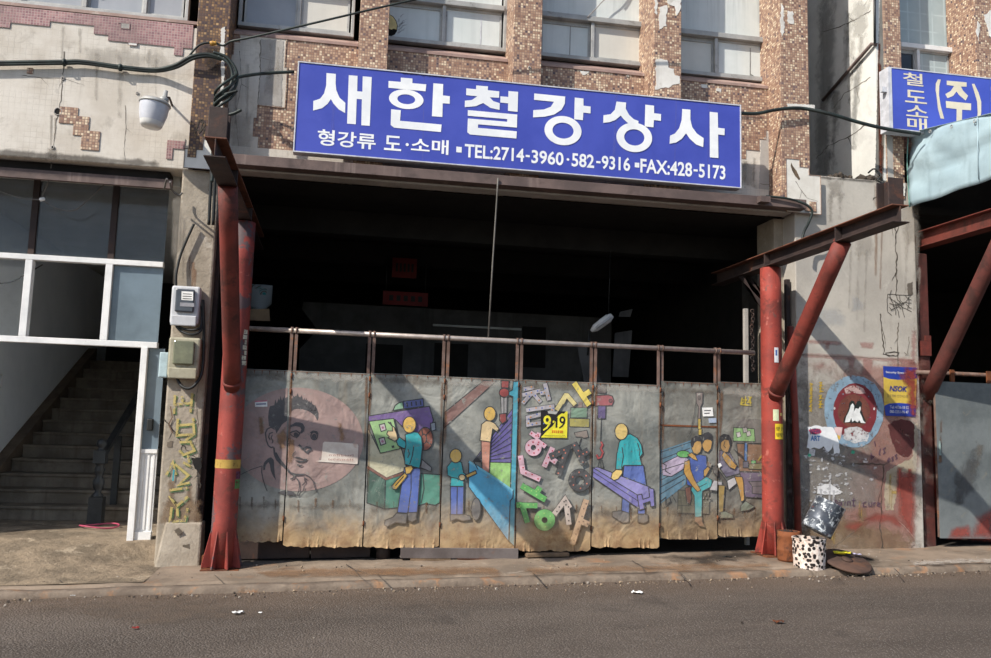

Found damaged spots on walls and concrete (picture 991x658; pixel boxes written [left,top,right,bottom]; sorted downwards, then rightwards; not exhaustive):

spalling [654,0,681,29]
spalling [655,59,680,90]
crack [816,77,870,159]
crack [891,227,899,294]